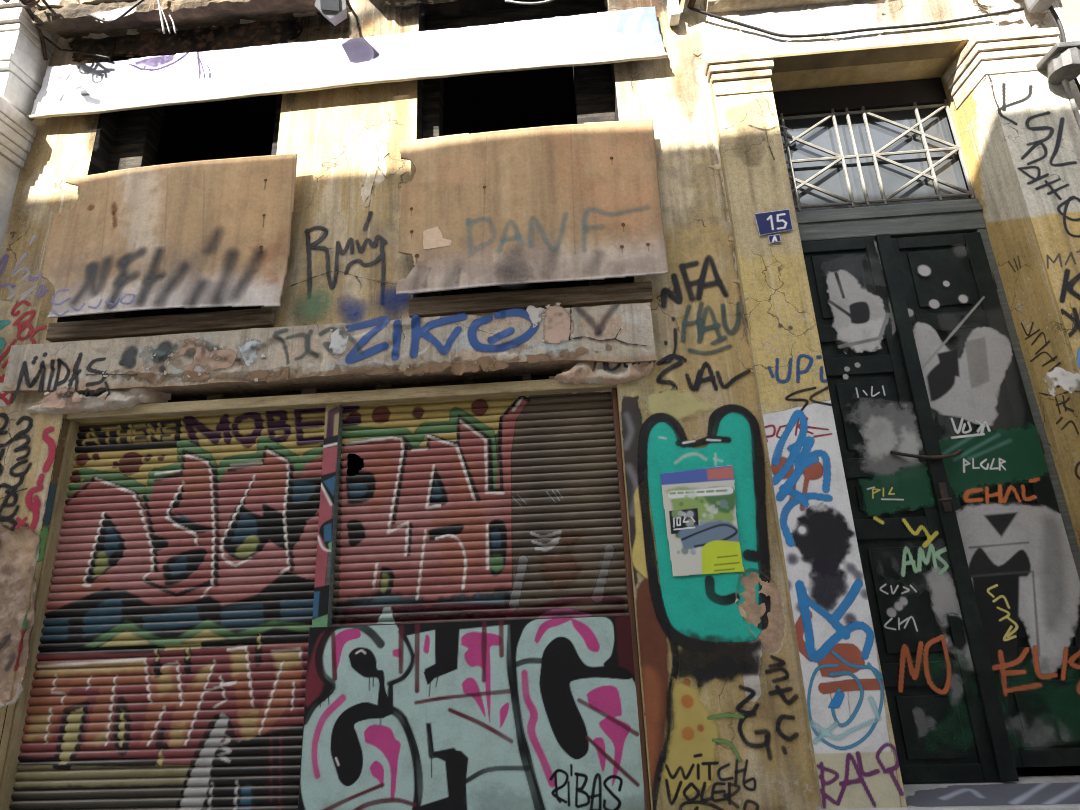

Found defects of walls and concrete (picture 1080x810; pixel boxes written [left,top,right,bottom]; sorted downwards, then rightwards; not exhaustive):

spalling [383,0,458,8]
spalling [739,0,889,47]
spalling [971,0,1050,32]
peeling [27,303,653,427]
peeling [1046,367,1080,396]
spalling [0,521,41,708]